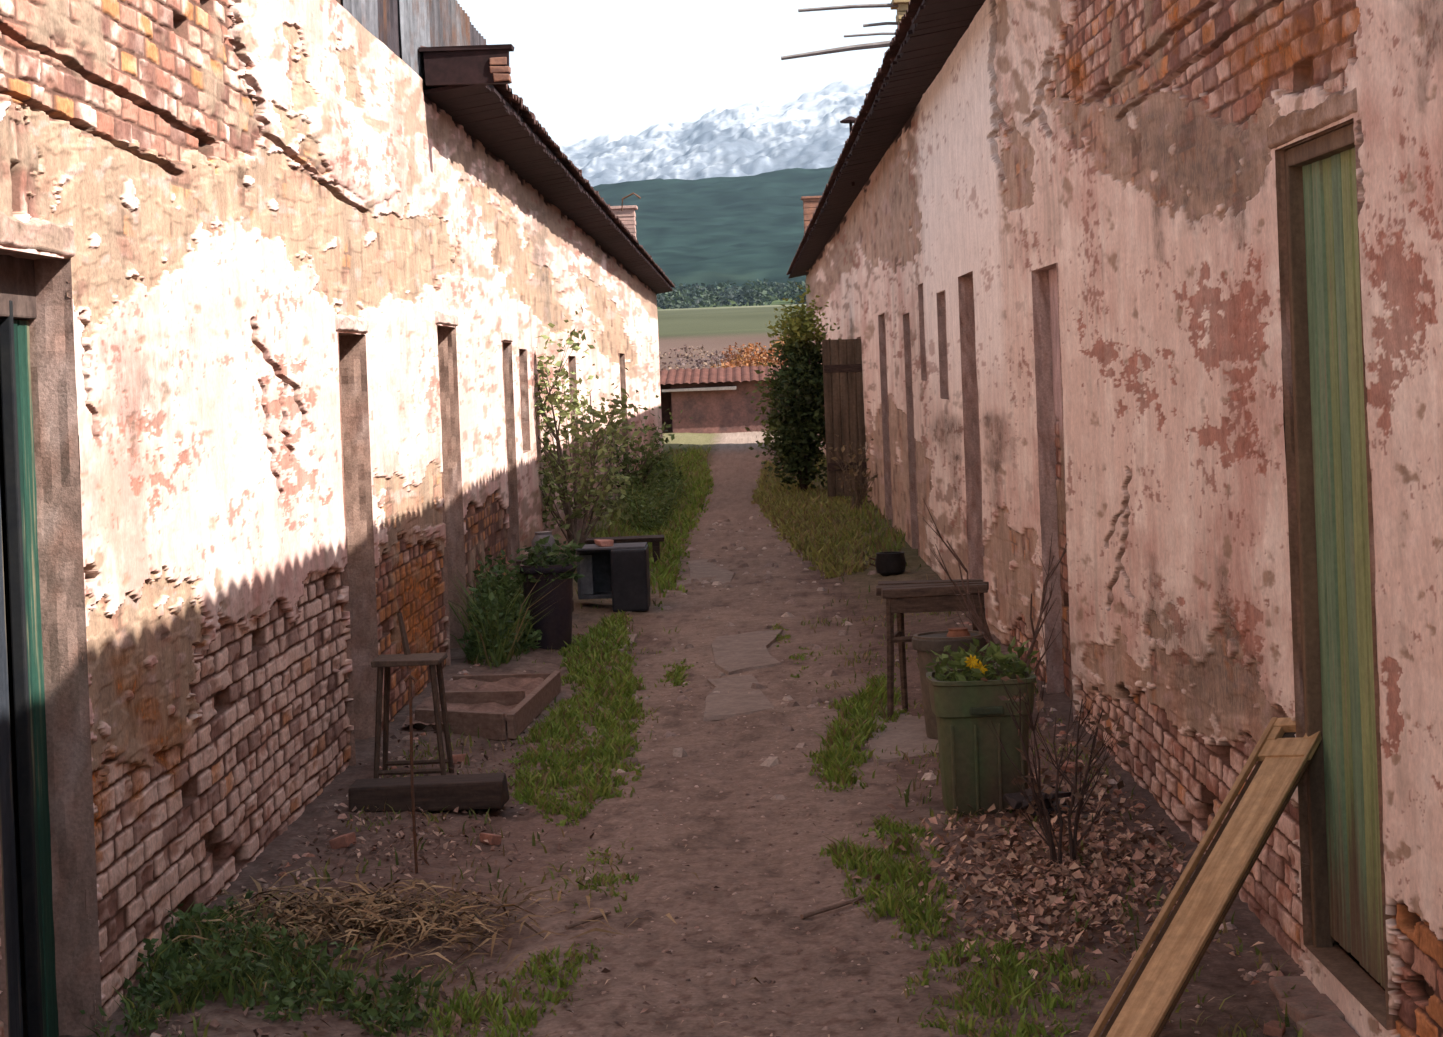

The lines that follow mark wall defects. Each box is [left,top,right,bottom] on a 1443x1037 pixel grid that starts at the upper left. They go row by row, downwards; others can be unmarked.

peeling [0,0,461,337]
flaking render [1044,0,1361,223]
crack [249,316,307,507]
peeling [1078,309,1173,432]
peeling [1173,255,1277,475]
peeling [1361,226,1438,437]
flaking render [369,461,448,732]
crack [1104,465,1135,611]
flaking render [82,566,352,1029]
flaking render [1074,596,1294,854]
flaking render [1239,800,1309,972]
flaking render [1387,902,1443,1037]